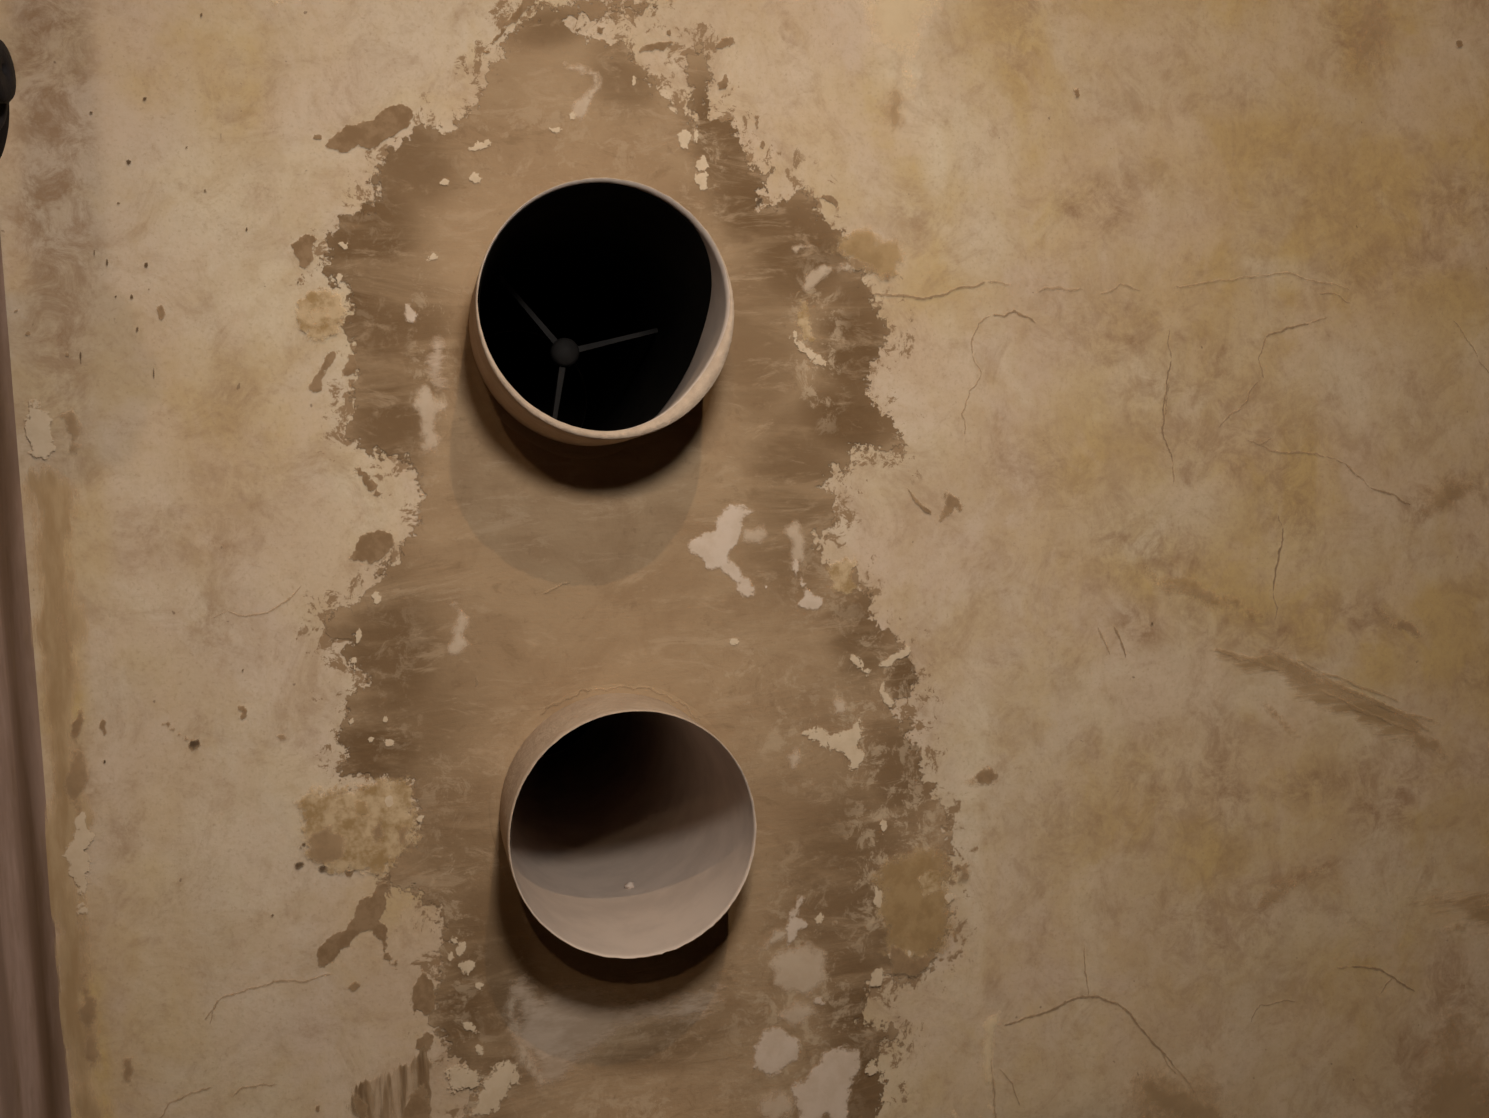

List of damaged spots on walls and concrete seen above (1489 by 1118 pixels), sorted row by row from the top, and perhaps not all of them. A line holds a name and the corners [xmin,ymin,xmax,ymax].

crack [872,281,1134,430]
crack [1162,332,1174,477]
crack [1177,272,1410,505]
crack [1273,516,1283,614]
spalling [295,779,420,875]
crack [991,953,1198,1116]